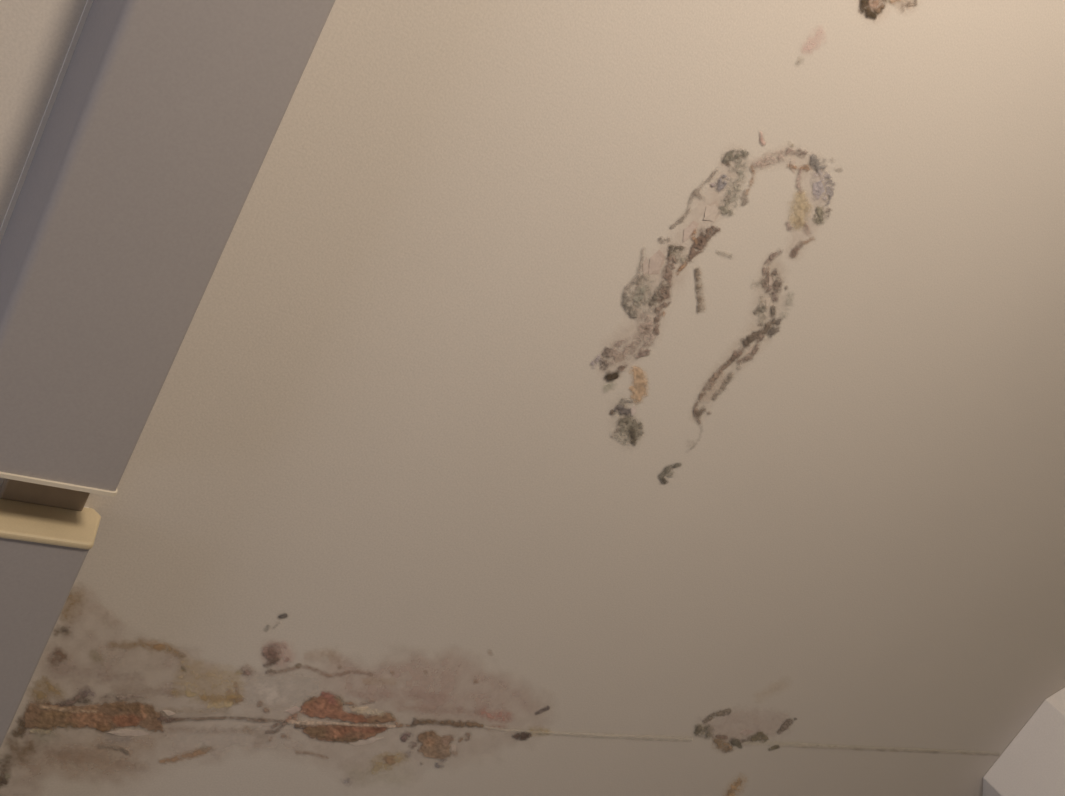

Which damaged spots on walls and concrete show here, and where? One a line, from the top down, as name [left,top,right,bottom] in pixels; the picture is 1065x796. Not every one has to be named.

peeling [591,145,835,445]
peeling [659,463,681,484]
water stain [186,644,331,712]
crack [174,715,283,723]
crack [411,719,484,727]
crack [513,706,550,740]
peeling [694,709,797,752]
water stain [0,720,33,786]